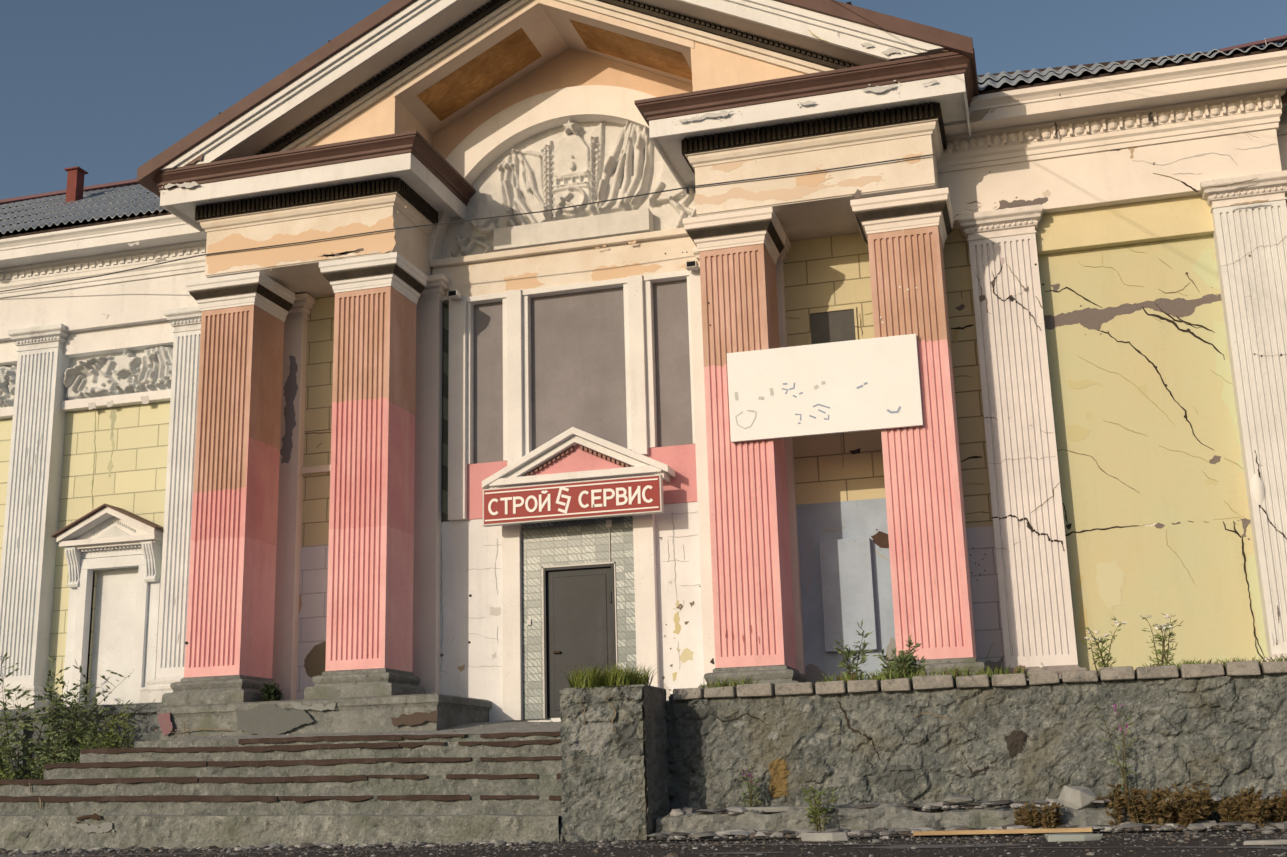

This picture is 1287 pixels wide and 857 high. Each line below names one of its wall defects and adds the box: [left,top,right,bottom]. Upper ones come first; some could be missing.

spalling [995,190,1051,210]
crack [1223,235,1287,266]
crack [951,246,1287,658]